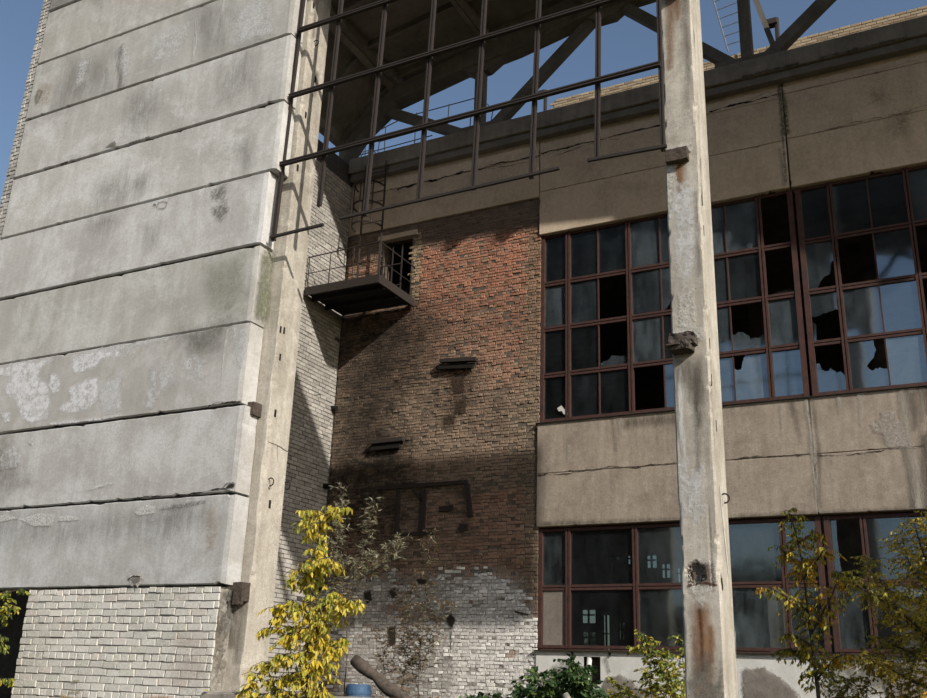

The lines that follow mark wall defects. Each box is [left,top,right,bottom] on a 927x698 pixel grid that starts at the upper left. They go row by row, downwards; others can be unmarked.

crack [709,90,779,112]
crack [397,125,660,191]
peeling [0,336,174,425]
crack [731,447,920,460]
water stain [899,388,927,509]
spalling [687,556,723,606]
rust [694,607,713,696]
flaking render [742,667,800,698]
flaking render [883,658,927,698]